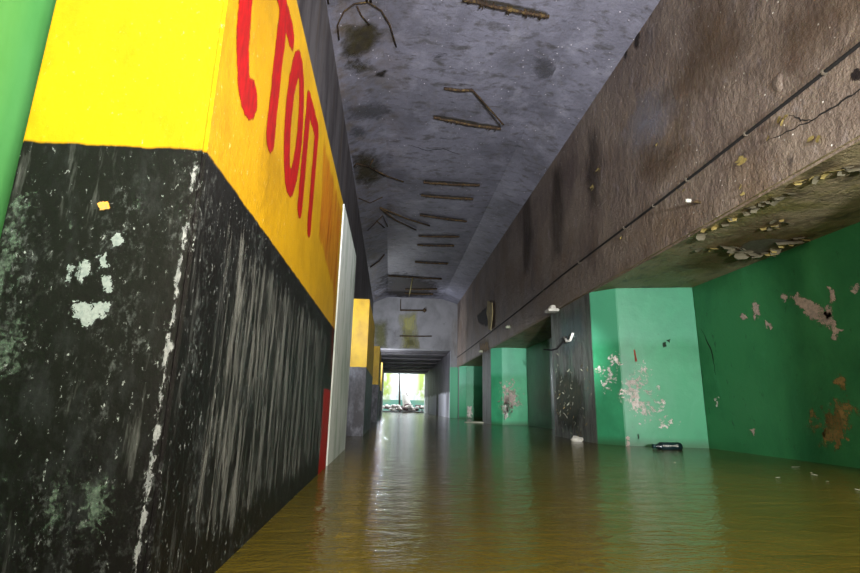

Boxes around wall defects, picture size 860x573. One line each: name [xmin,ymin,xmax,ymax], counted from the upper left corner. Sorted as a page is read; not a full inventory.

crack [767,89,860,141]
peeling [689,166,860,268]
peeling [64,233,127,327]
peeling [740,301,773,330]
peeling [781,286,844,340]
peeling [498,379,524,421]
peeling [555,351,680,437]